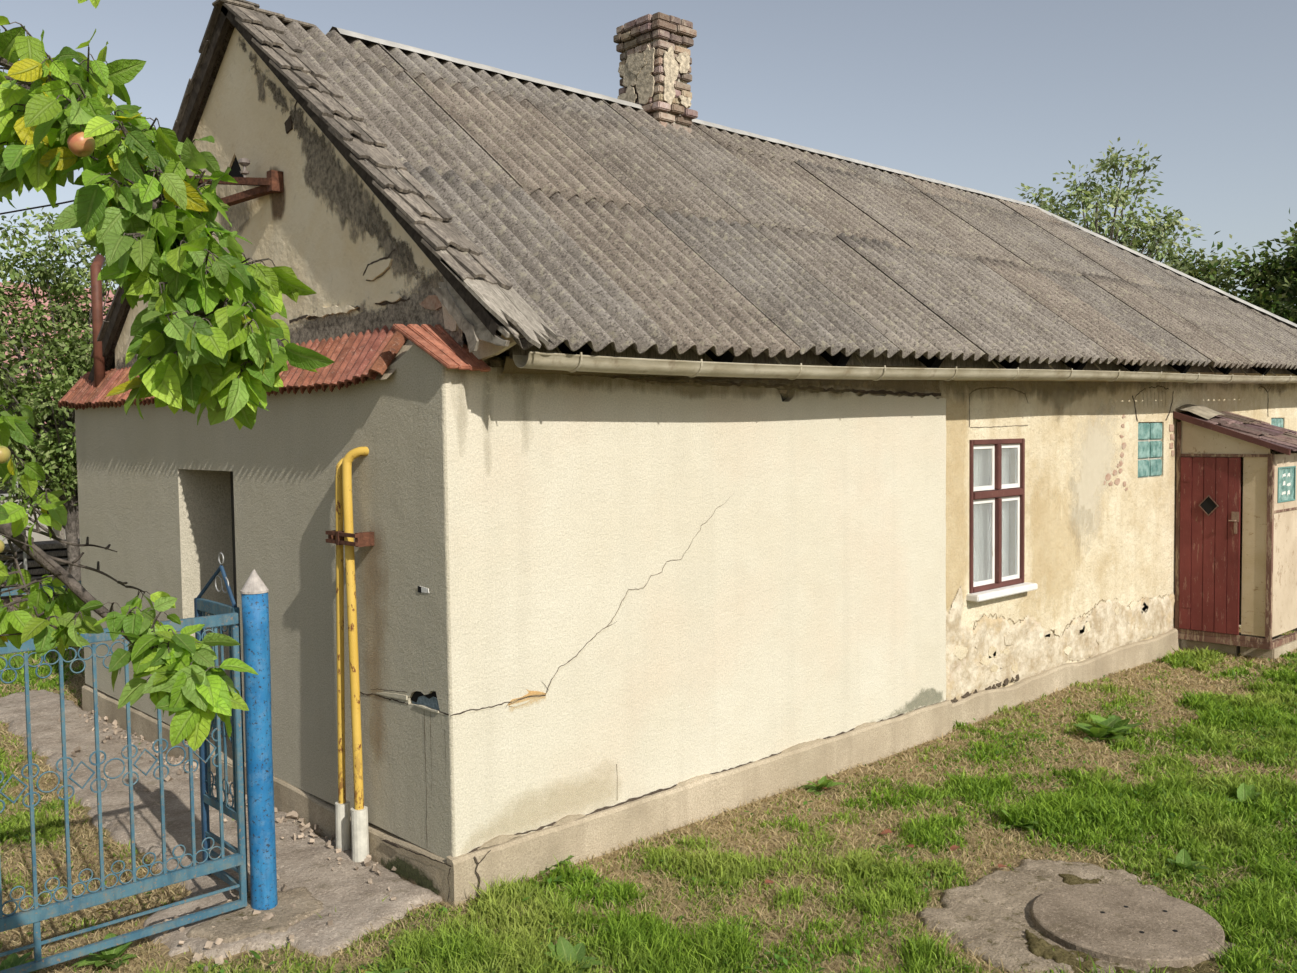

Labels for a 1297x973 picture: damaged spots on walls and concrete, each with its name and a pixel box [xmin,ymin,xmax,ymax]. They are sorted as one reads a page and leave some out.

rust [270,186,285,219]
peeling [363,249,395,281]
flaking render [419,287,458,331]
damp [487,352,1297,412]
peeling [946,588,1175,703]
spalling [360,689,449,716]